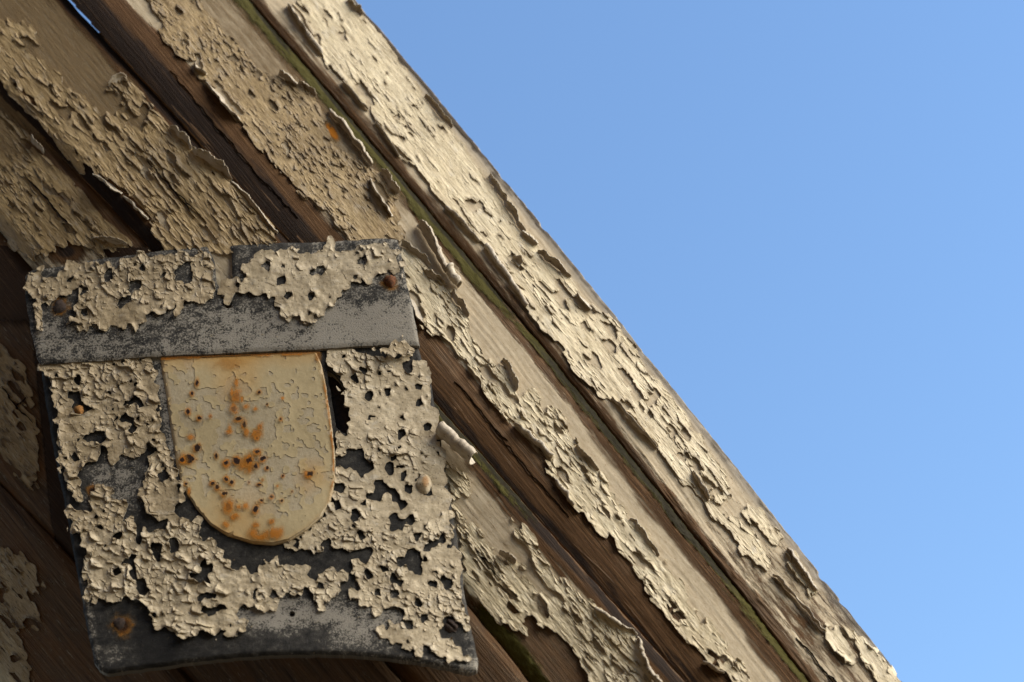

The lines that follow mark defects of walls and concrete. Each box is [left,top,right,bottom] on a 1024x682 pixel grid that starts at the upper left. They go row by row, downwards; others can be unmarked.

rust [179,434,200,464]
rust [185,379,212,421]
rust [161,352,321,360]
rust [209,379,293,540]
rust [323,374,335,488]
peeling [0,0,751,682]